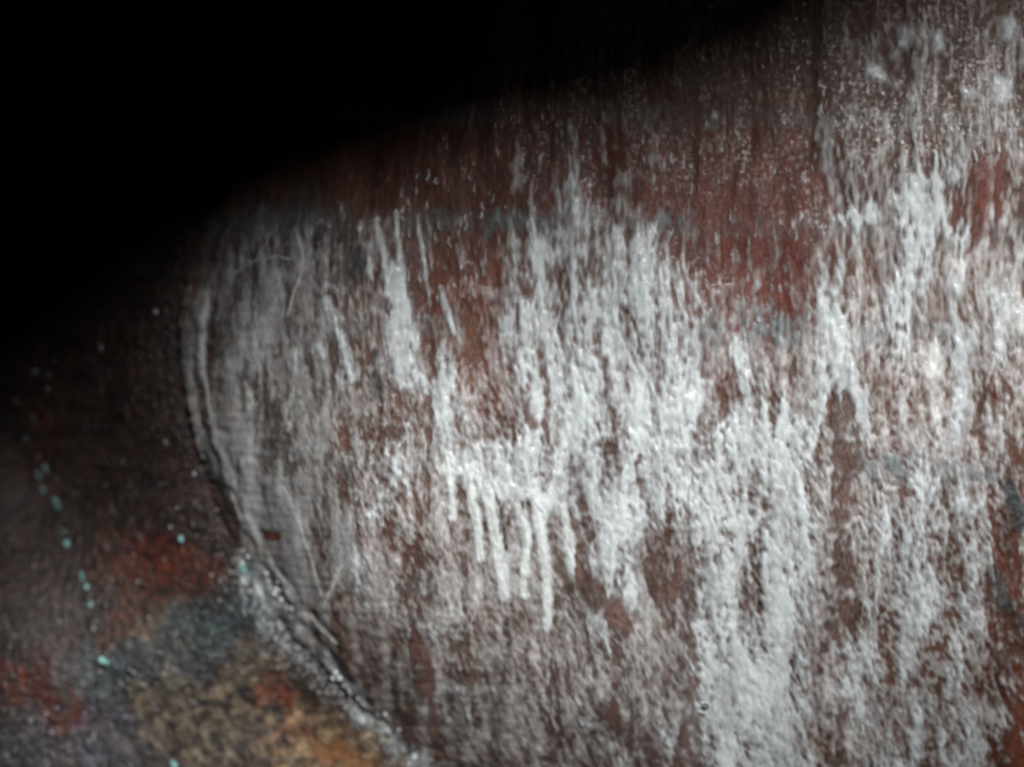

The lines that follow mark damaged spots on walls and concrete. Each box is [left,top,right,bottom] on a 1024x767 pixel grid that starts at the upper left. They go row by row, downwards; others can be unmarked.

water stain [180,72,1024,767]